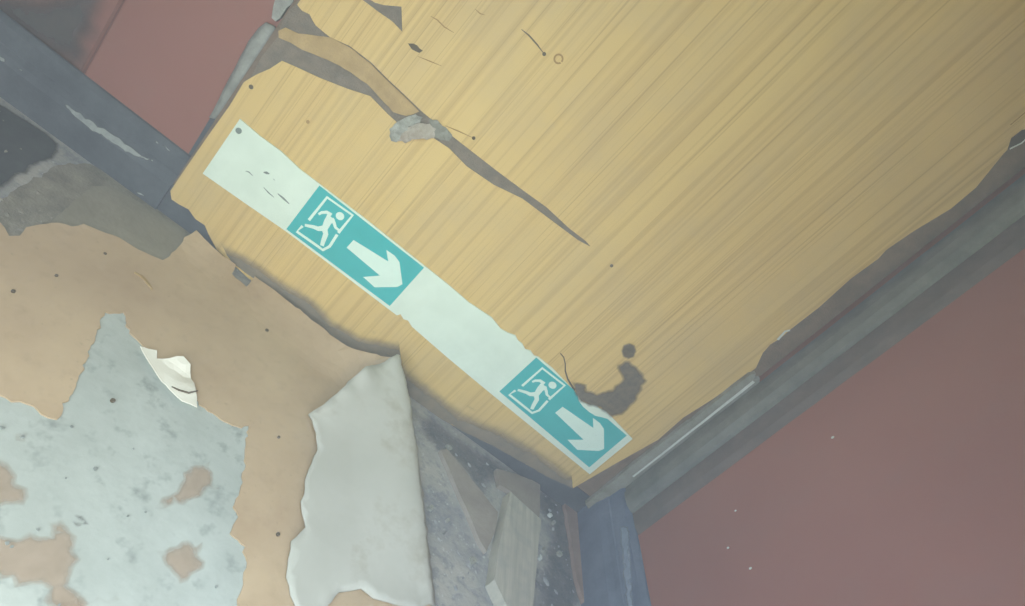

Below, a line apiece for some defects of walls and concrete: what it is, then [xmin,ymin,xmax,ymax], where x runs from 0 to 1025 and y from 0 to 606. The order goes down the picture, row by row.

spalling [280,3,329,37]
peeling [66,105,153,161]
peeling [0,313,248,606]